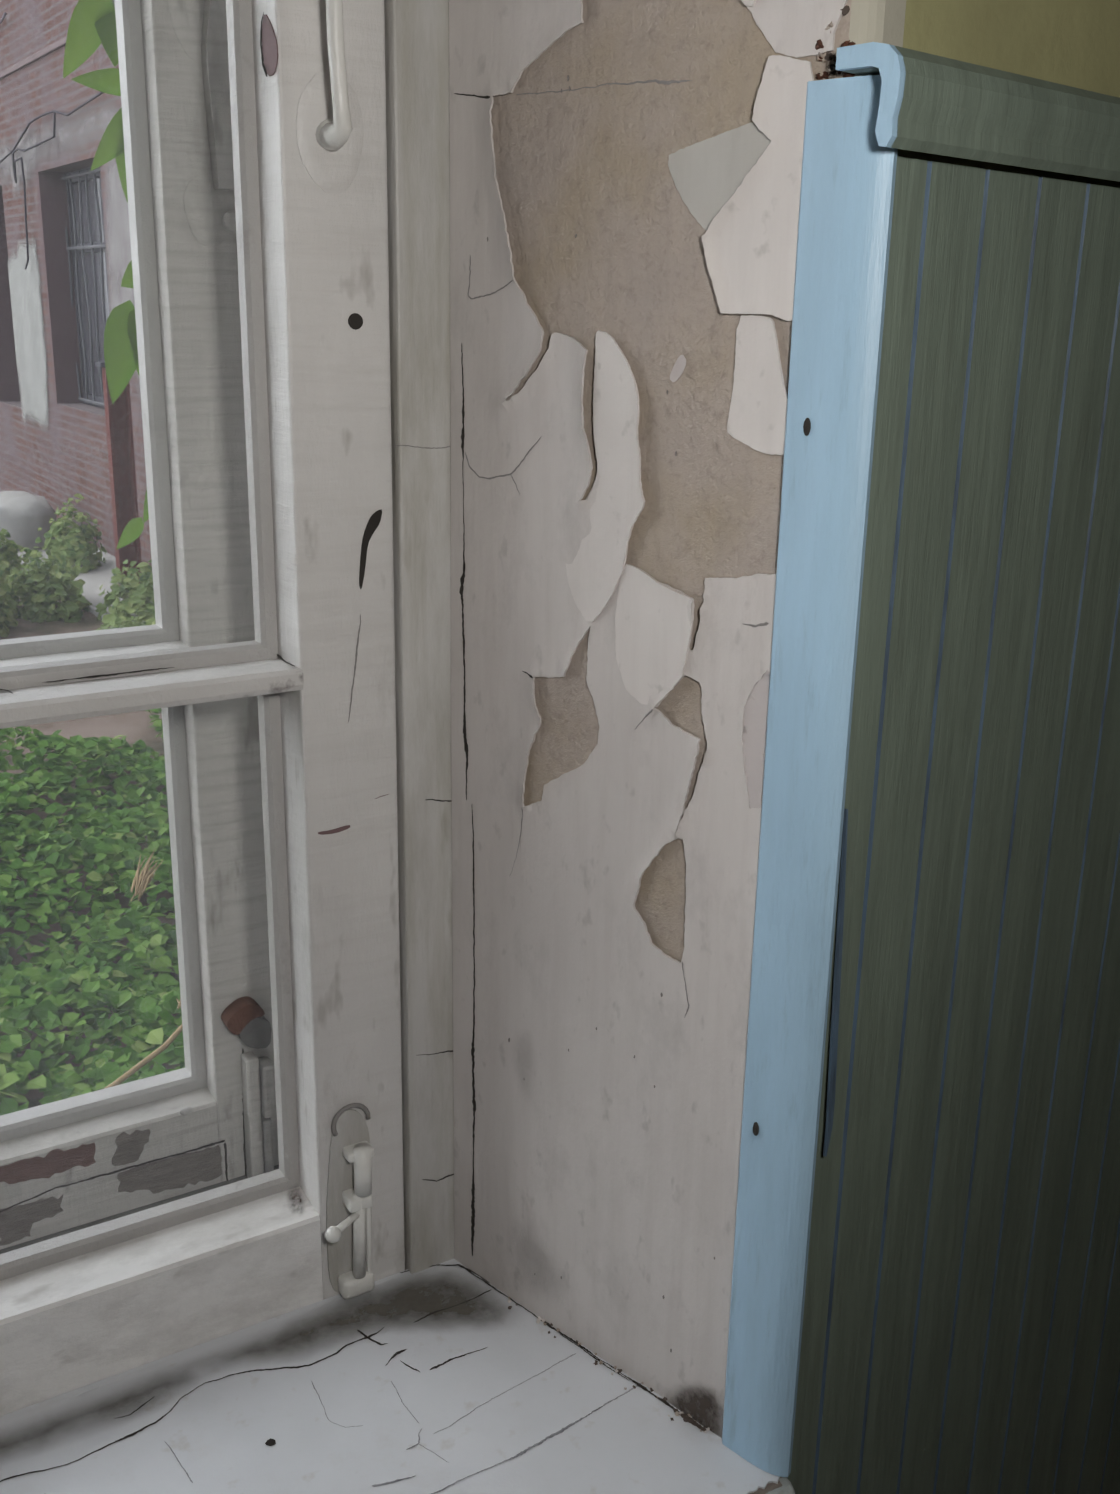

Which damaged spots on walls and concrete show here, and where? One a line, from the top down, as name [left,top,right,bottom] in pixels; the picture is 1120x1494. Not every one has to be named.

peeling [454,0,856,877]
crack [0,344,710,1494]
peeling [638,838,689,1018]
peeling [0,1089,247,1246]
peeling [750,1481,783,1494]